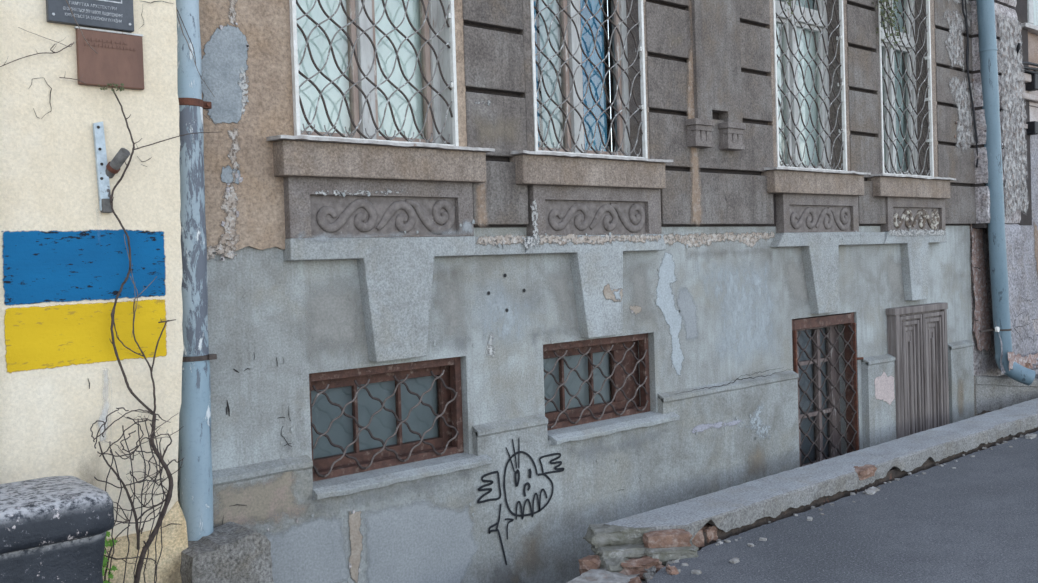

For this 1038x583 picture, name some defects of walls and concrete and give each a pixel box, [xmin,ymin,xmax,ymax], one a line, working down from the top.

spalling [943,0,975,151]
peeling [207,128,243,261]
peeling [449,200,775,375]
spalling [1007,352,1038,371]